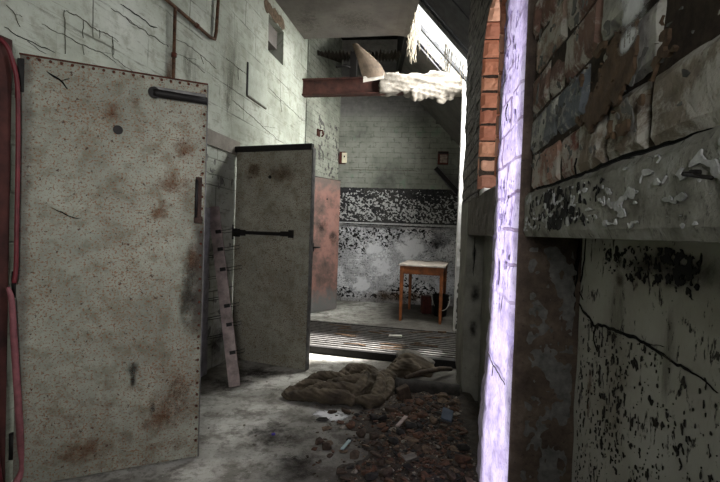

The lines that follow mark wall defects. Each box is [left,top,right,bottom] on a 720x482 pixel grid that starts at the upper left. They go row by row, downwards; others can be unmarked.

crack [5,5,132,71]
peeling [338,189,458,264]
flaking render [523,149,720,231]
crack [532,128,713,190]
peeling [337,277,437,301]
crack [571,238,718,393]